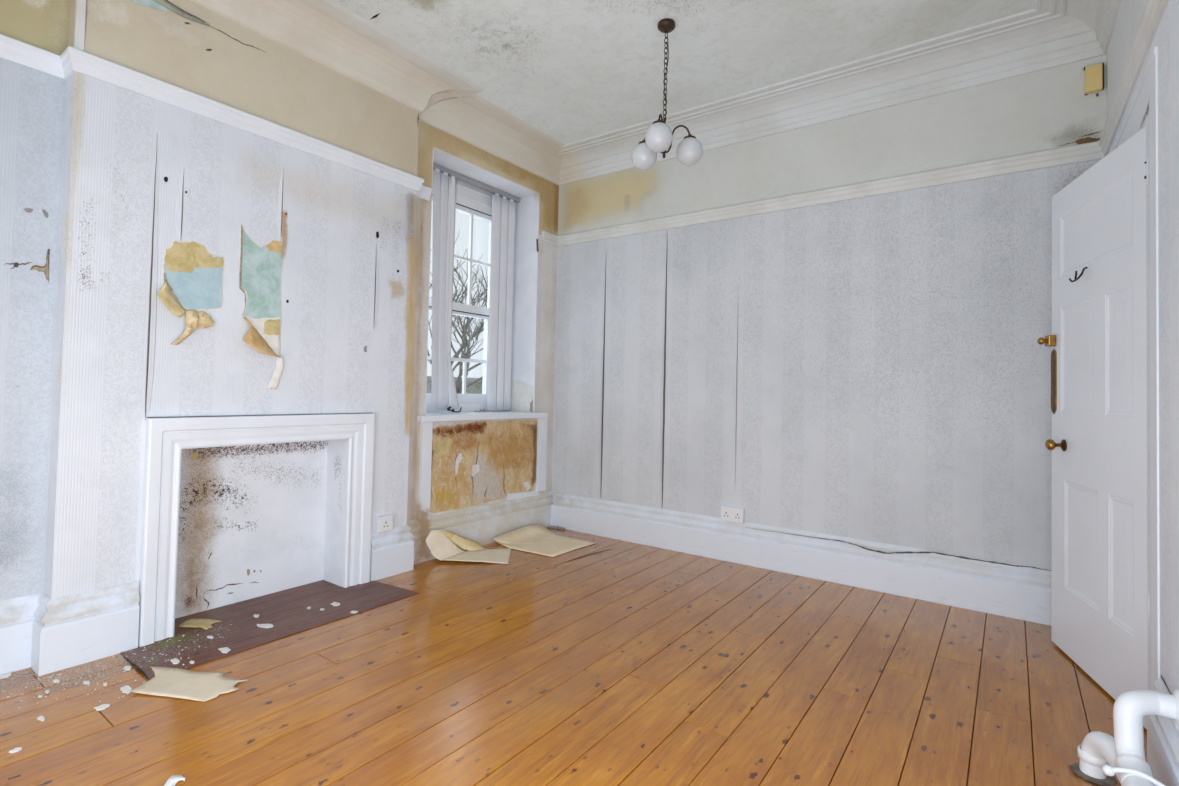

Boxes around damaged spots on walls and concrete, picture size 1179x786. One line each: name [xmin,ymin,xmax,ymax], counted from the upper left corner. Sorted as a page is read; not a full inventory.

flaking render [30,249,50,282]
flaking render [164,242,223,273]
flaking render [244,316,280,356]
damp [219,122,1100,563]
flaking render [430,379,539,513]
damp [175,440,342,618]
crack [746,527,1052,571]